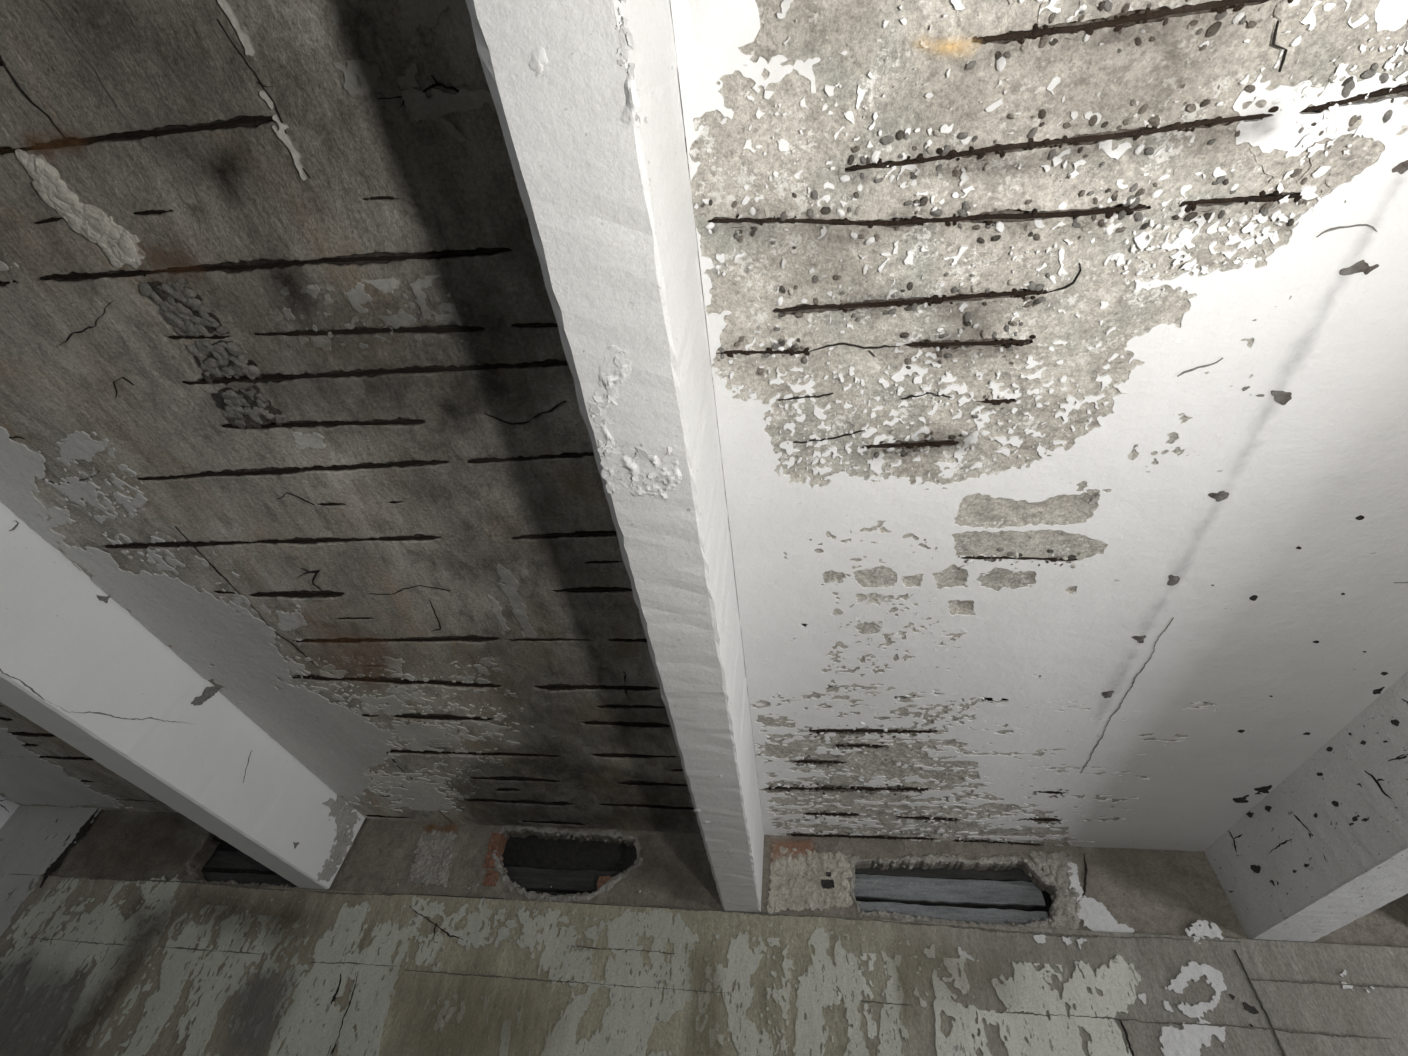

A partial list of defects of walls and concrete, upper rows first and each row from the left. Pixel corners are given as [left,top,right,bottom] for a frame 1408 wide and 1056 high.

crack [1271,20,1288,72]
crack [1317,224,1378,237]
crack [1047,263,1082,293]
crack [808,342,900,357]
spalling [221,417,425,429]
peeling [467,345,682,502]
spalling [687,0,1408,846]
peeling [0,426,589,882]
spalling [534,684,671,728]
crack [1081,617,1174,773]
crack [1365,754,1408,799]
peeling [0,717,1259,1056]